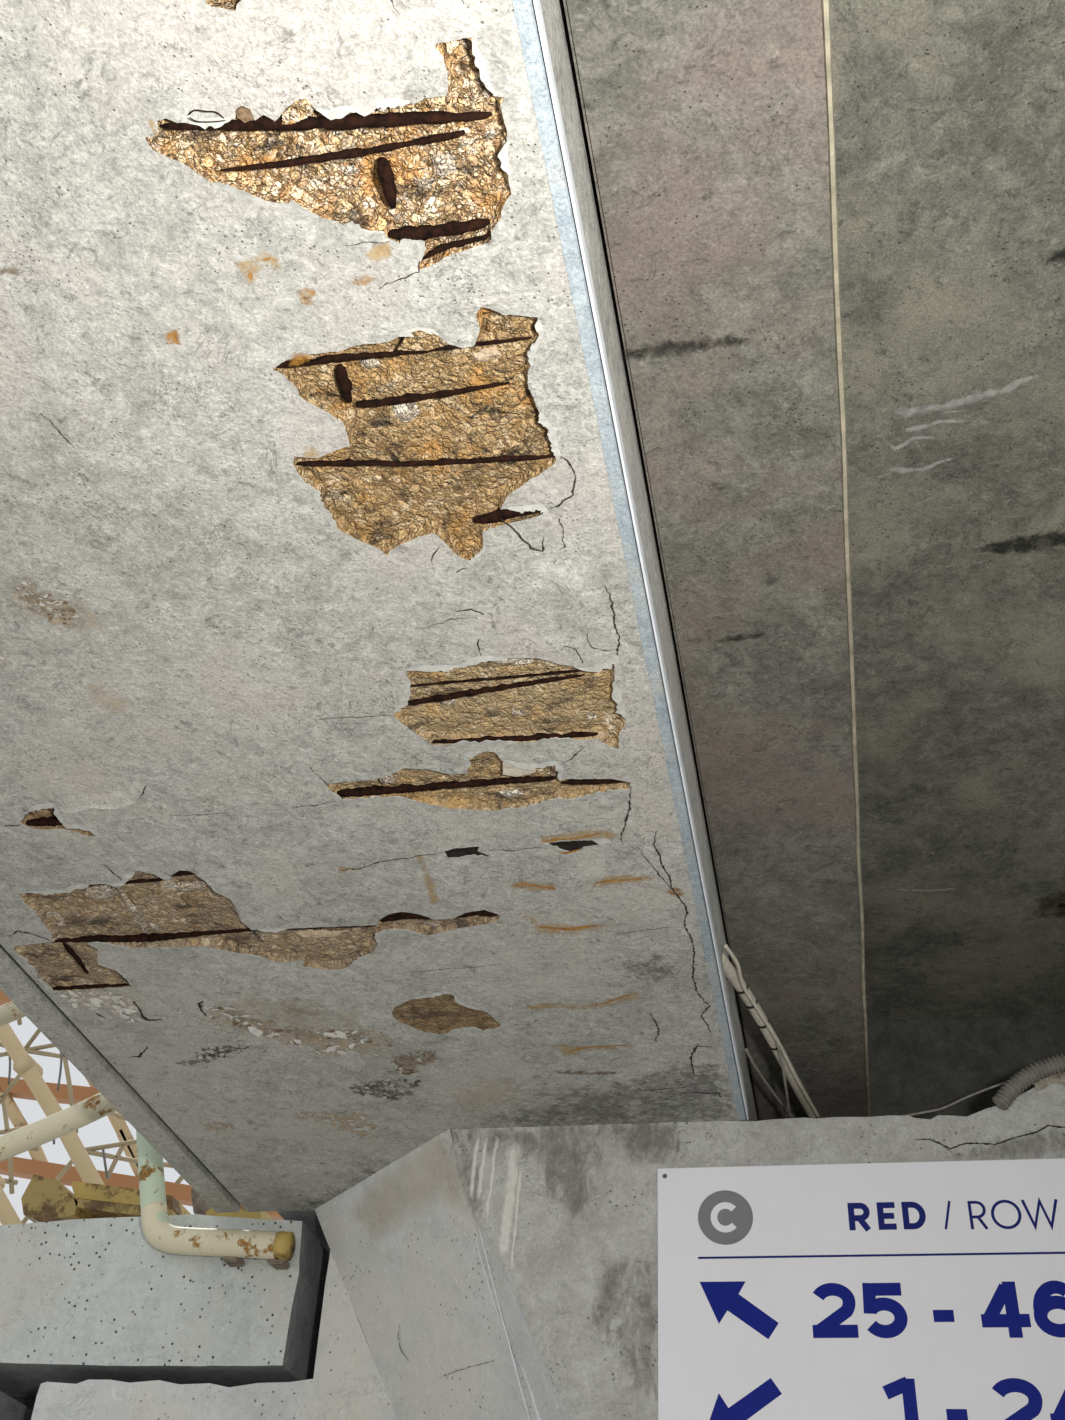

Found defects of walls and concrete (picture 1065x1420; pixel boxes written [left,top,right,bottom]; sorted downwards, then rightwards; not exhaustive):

spalling [193,0,256,14]
spalling [146,38,512,271]
spalling [273,306,561,566]
spalling [326,655,630,812]
spalling [13,870,501,1024]
peeling [177,1005,442,1138]
spalling [392,991,501,1034]
crack [914,1125,1065,1152]